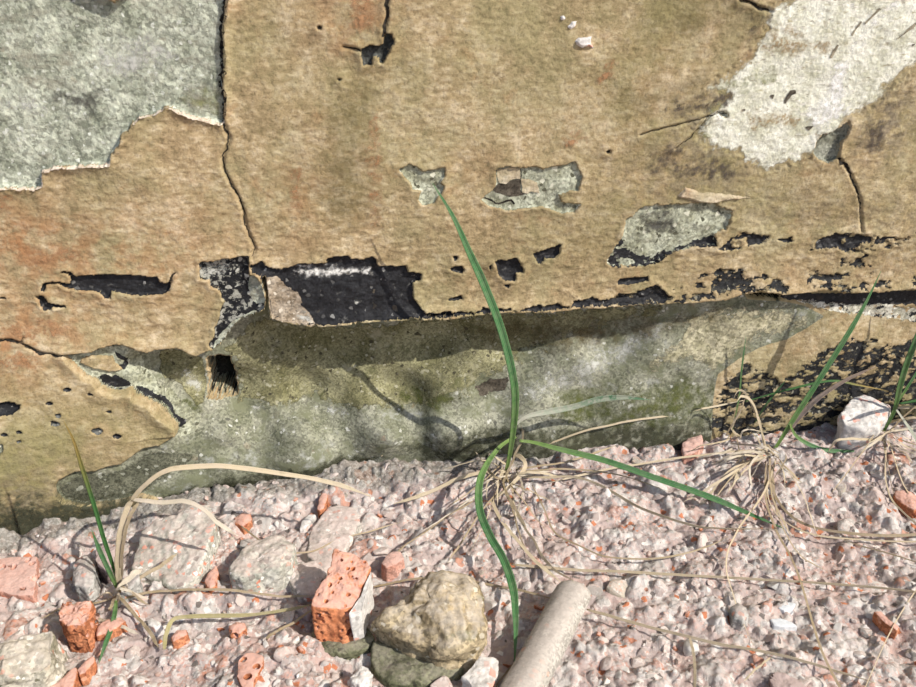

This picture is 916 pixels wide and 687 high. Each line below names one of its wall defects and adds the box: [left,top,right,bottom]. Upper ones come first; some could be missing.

crack [381,0,389,37]
crack [739,0,771,11]
peeling [0,0,225,191]
peeling [700,0,916,171]
crack [218,0,255,256]
peeling [399,164,445,205]
peeling [481,162,582,214]
crack [838,157,862,231]
crack [0,337,63,357]
spalling [37,187,916,502]
spalling [317,493,328,519]
spalling [893,490,916,518]